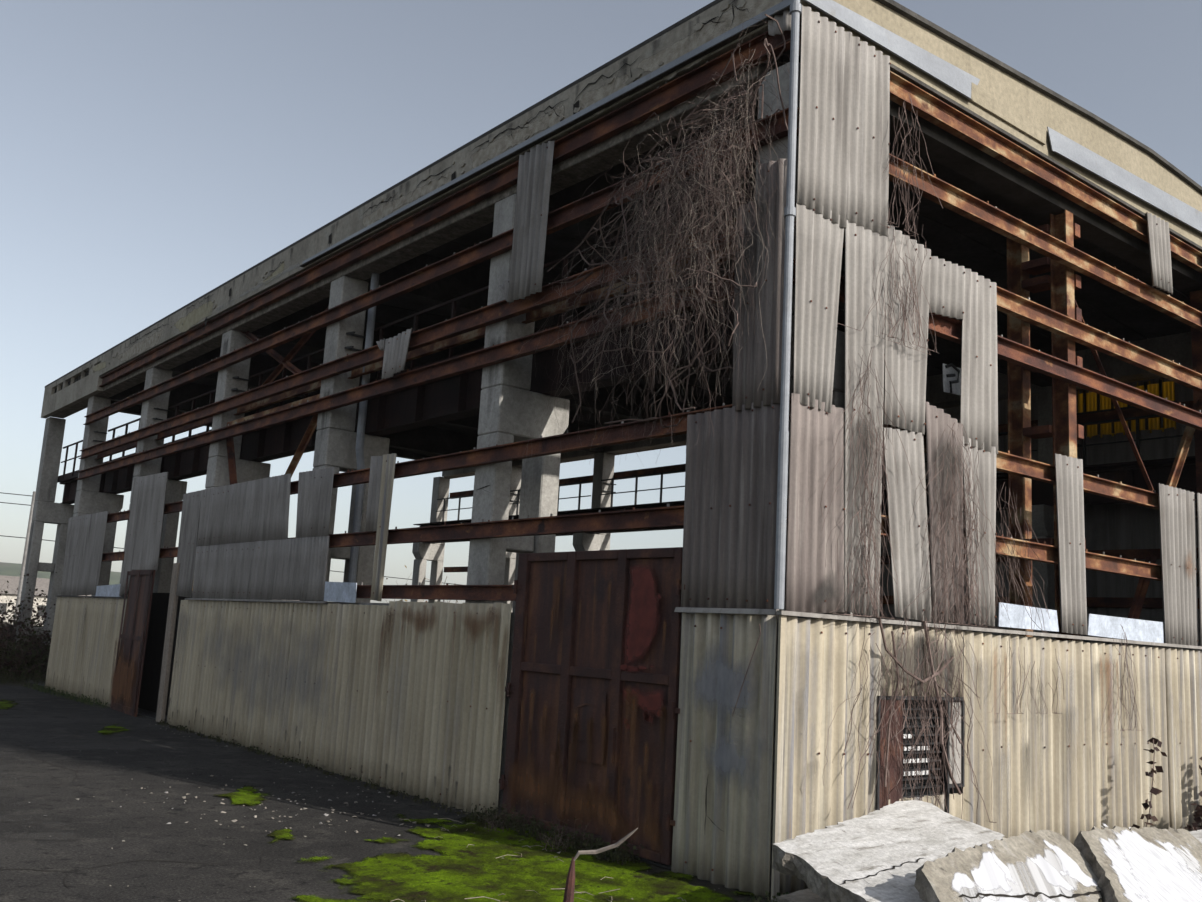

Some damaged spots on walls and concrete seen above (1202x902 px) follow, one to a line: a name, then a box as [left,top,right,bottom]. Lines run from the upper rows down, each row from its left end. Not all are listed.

crack [695,0,749,38]
crack [361,56,640,216]
corrosion [111,641,139,707]
crack [842,858,922,884]
crack [959,890,1101,902]